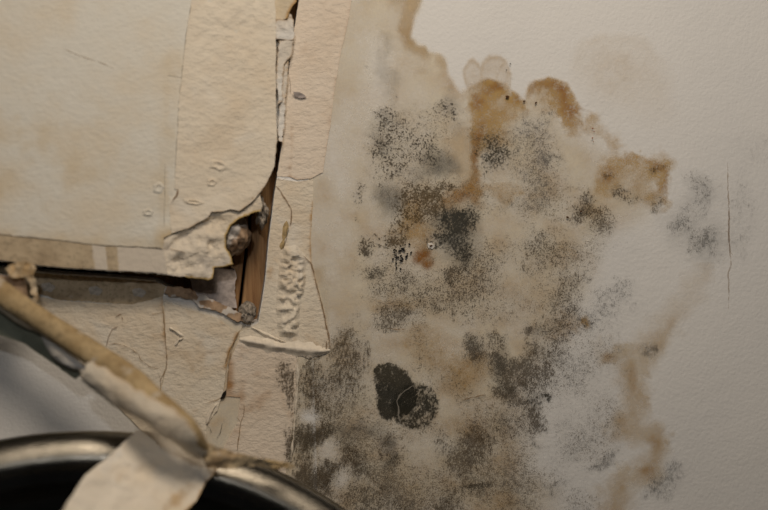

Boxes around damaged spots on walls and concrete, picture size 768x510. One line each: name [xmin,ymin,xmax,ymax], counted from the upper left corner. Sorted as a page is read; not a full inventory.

flaking render [275,14,295,105]
water stain [275,0,641,510]
peeling [24,273,238,438]
crack [106,312,167,389]
crack [208,331,240,403]
water stain [206,319,247,448]
water stain [605,336,679,510]